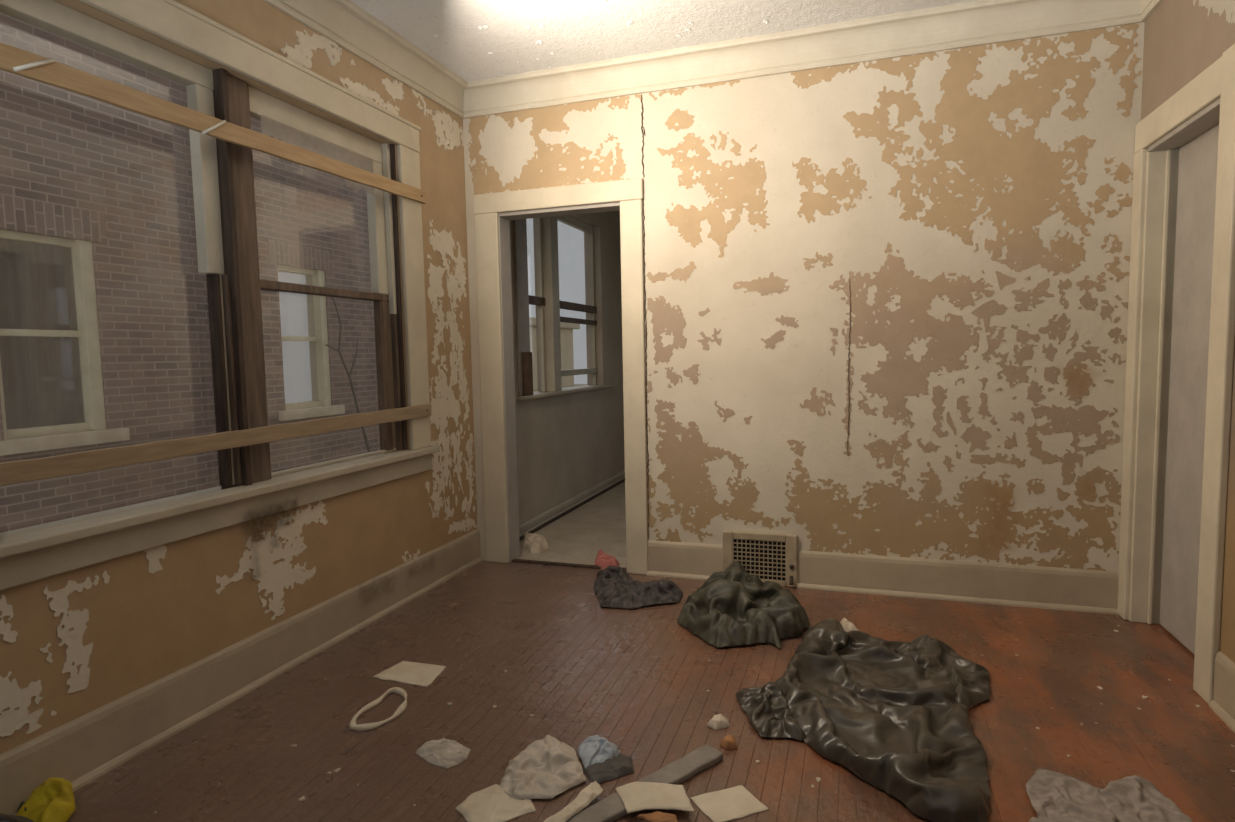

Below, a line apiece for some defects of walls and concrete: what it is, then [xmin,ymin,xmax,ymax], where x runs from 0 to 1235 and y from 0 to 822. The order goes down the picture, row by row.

peeling [1193,0,1235,24]
peeling [280,24,1142,571]
peeling [144,545,167,574]
peeling [215,501,328,620]
peeling [0,595,18,643]
peeling [39,570,110,693]
peeling [0,671,57,737]